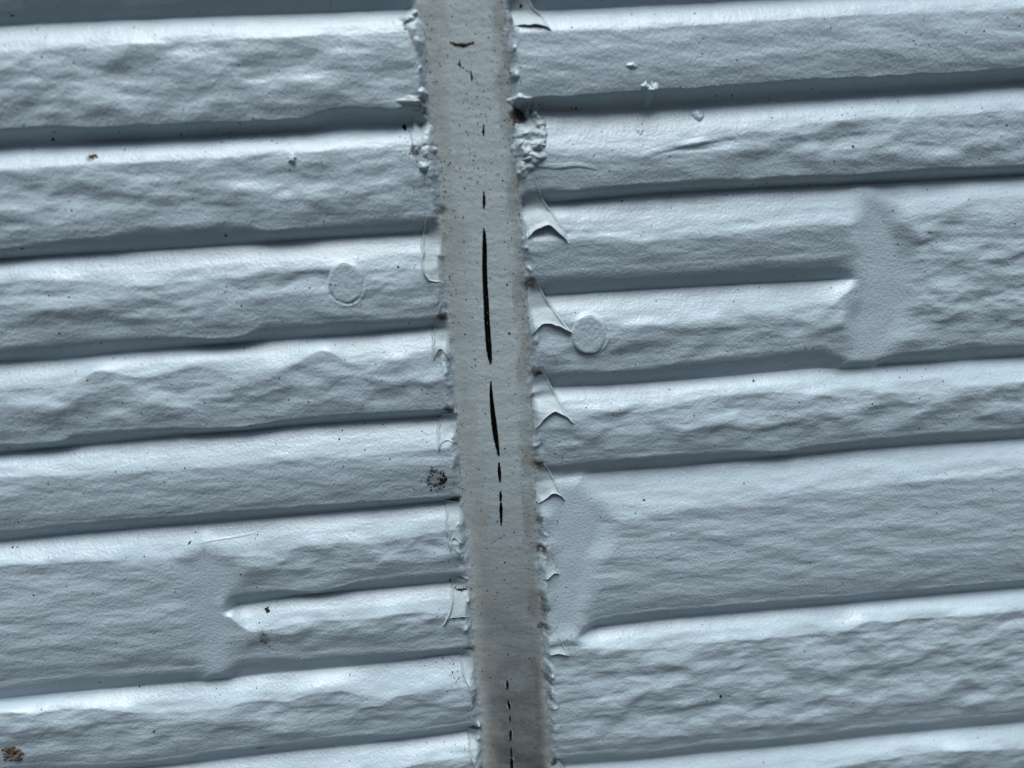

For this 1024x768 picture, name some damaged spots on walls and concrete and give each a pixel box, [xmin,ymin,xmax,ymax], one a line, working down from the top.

peeling [511,0,551,30]
peeling [521,175,569,243]
peeling [419,213,444,283]
peeling [527,279,573,334]
peeling [431,319,451,361]
crack [482,191,503,539]
peeling [532,370,575,428]
peeling [535,462,565,503]
peeling [444,500,466,550]
peeling [442,577,471,626]
peeling [543,625,569,655]
crack [506,680,514,768]